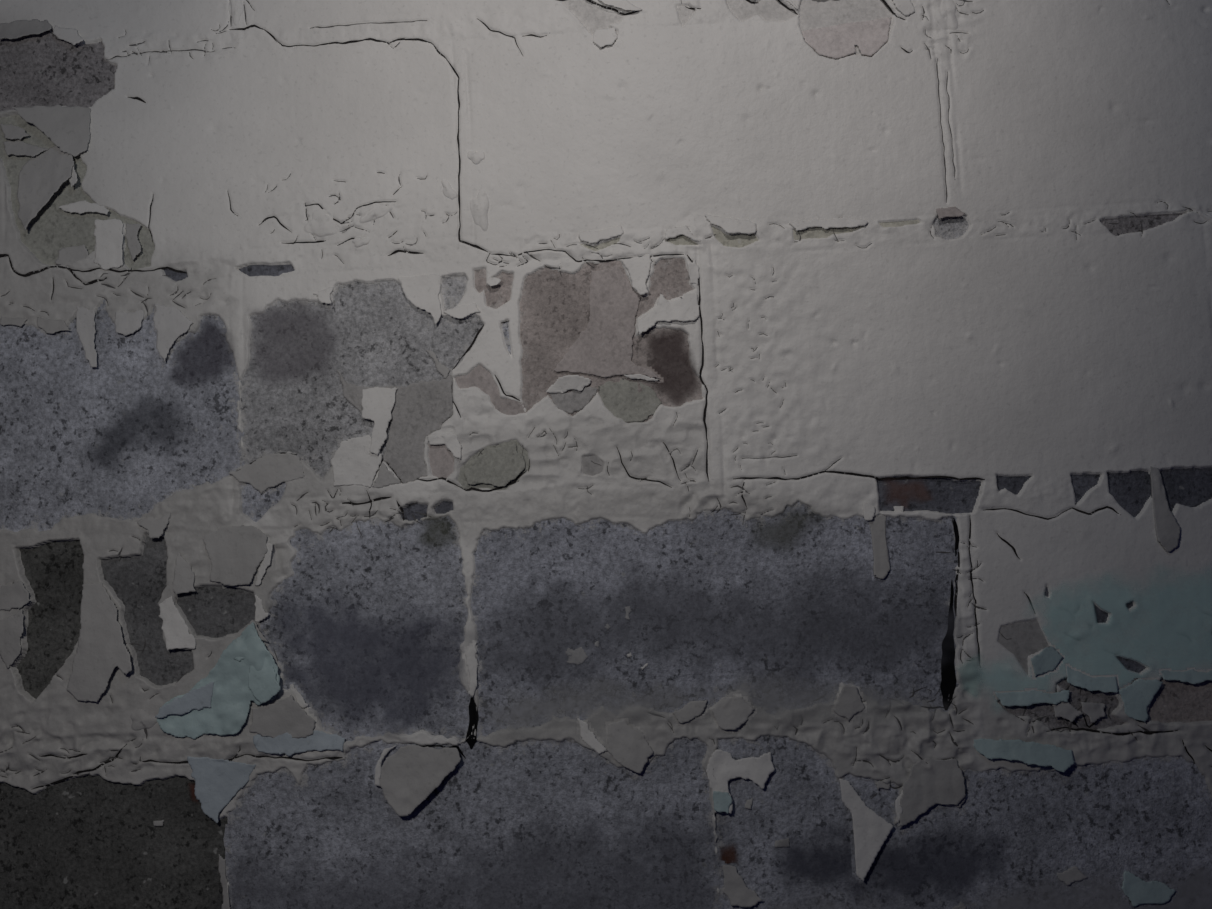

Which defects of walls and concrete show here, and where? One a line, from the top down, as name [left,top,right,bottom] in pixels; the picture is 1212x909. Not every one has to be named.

peeling [727,0,915,60]
peeling [0,19,188,282]
peeling [789,207,969,240]
crack [981,201,1207,240]
crack [106,0,985,537]
water stain [652,333,693,401]
peeling [0,211,1212,909]
crack [764,506,1121,799]
crack [228,749,343,761]
crack [421,697,479,759]